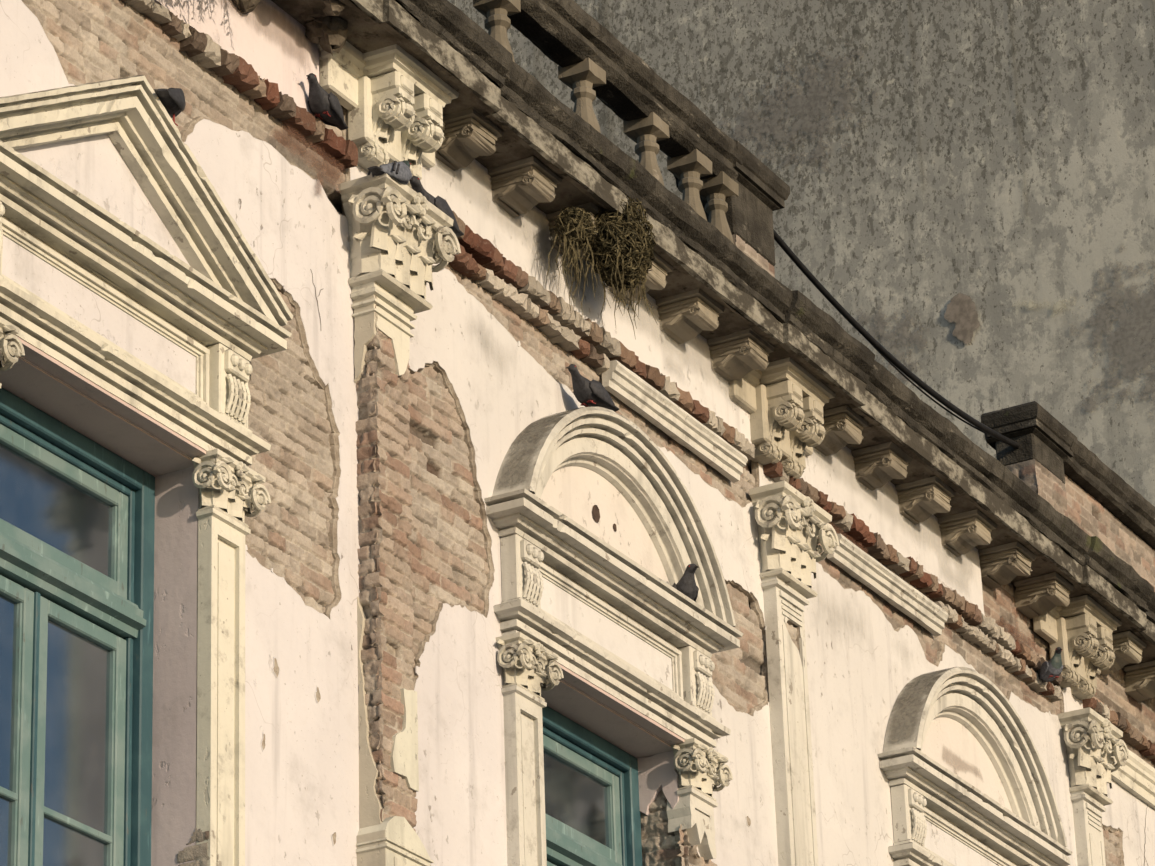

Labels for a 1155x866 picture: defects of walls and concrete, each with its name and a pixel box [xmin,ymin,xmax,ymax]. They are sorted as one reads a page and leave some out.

spalling [22,0,351,216]